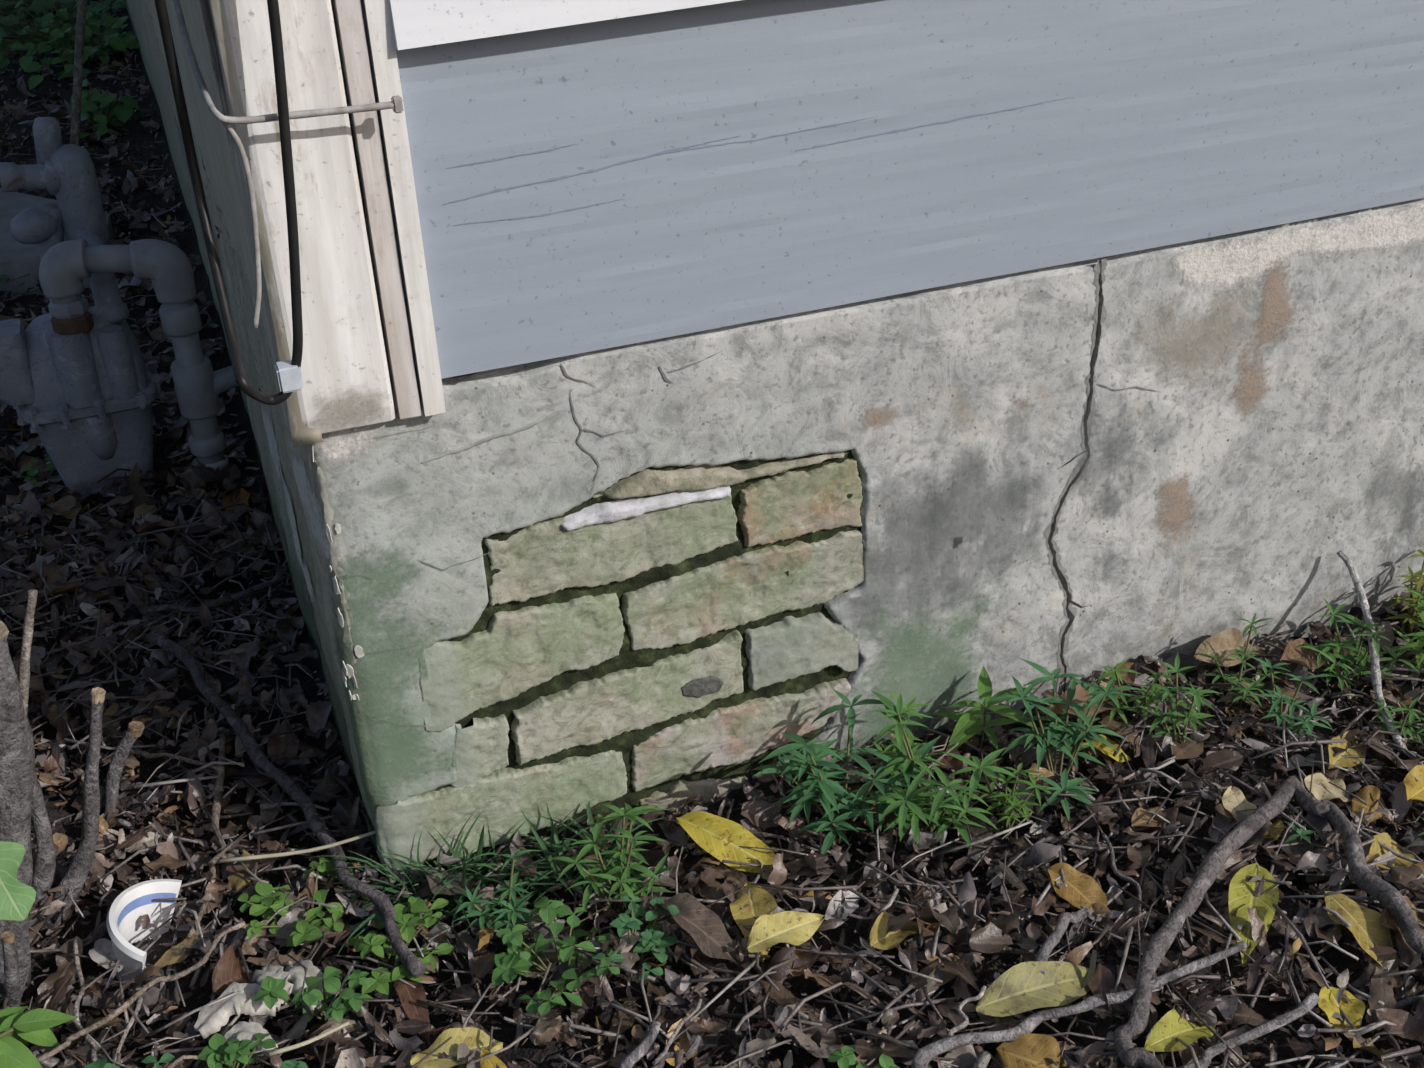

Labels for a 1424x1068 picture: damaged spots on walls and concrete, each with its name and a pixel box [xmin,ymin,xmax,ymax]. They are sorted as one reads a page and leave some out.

crack [559,362,623,502]
spalling [374,450,864,873]
crack [659,352,720,383]
crack [1044,258,1160,693]